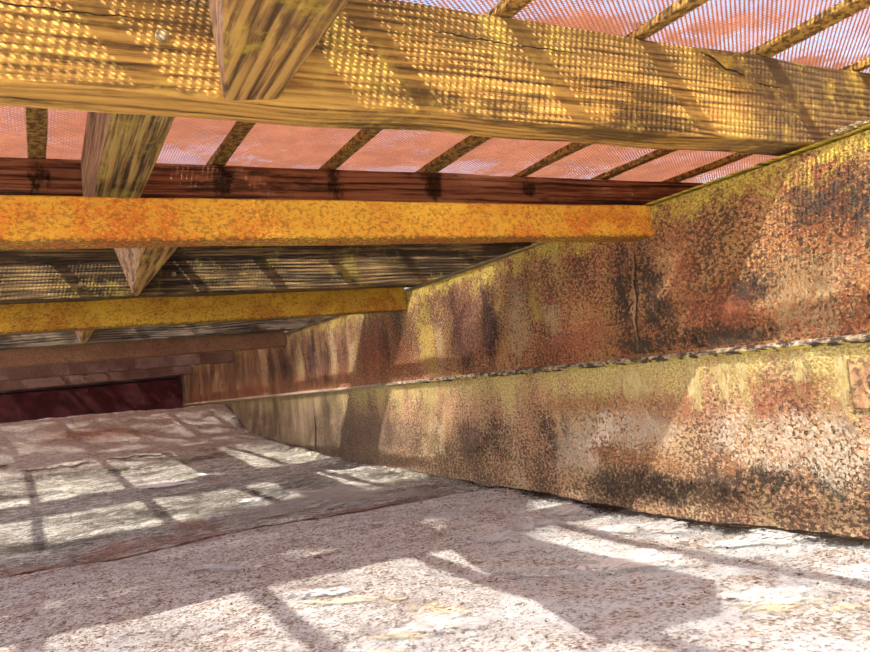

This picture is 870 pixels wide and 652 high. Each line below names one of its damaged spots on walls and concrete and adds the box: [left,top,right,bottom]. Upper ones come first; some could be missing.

water stain [415,299,439,376]
water stain [482,291,498,363]
crack [624,249,640,346]
water stain [589,420,870,507]
water stain [471,504,691,543]